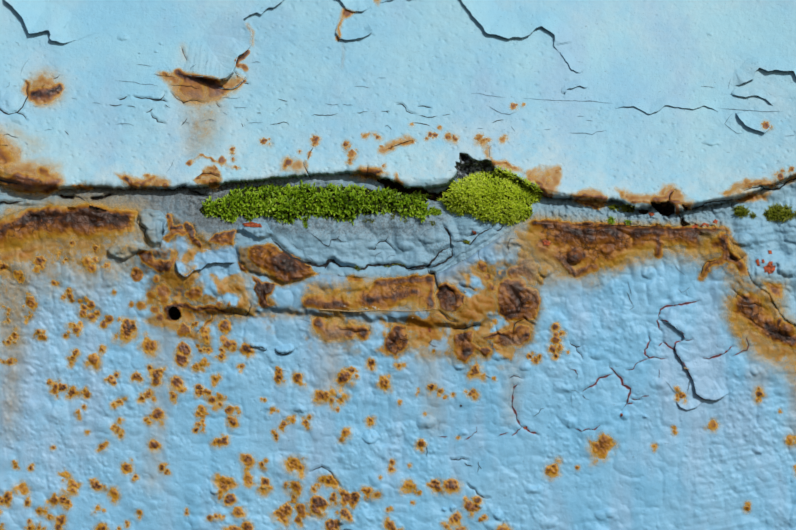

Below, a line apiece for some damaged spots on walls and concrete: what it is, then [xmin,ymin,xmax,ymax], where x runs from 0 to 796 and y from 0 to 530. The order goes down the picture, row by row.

peeling [5,0,97,43]
peeling [168,0,283,89]
peeling [462,0,572,53]
rust [160,50,250,135]
crack [161,160,218,195]
spalling [455,153,496,183]
crack [579,178,796,228]
rust [0,133,796,447]
crack [570,257,743,406]
crack [706,289,763,359]
rust [0,471,119,530]
rust [273,456,381,530]